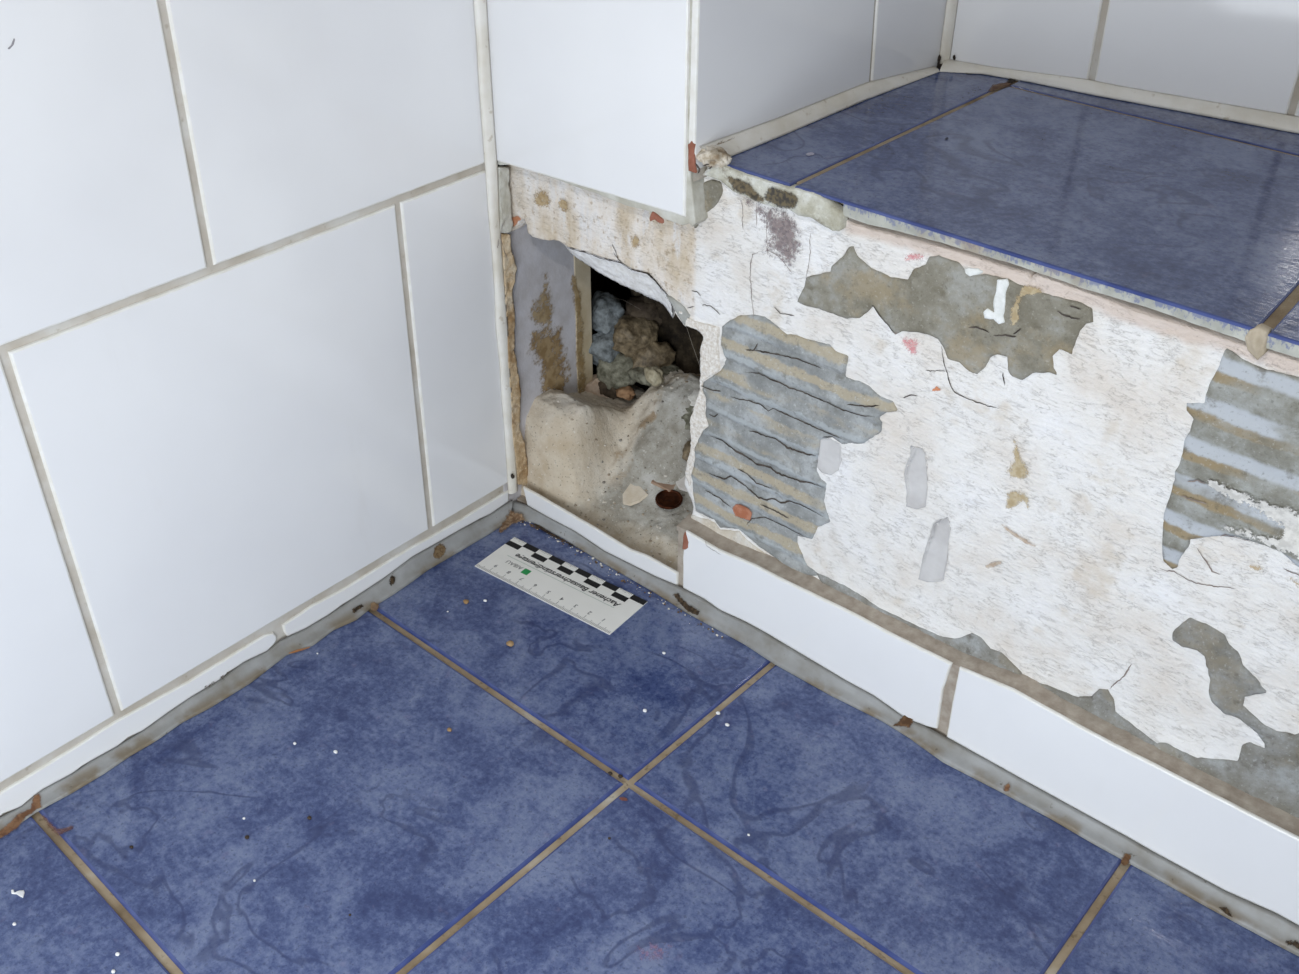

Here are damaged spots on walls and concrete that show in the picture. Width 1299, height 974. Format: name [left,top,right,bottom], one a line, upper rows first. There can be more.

flaking render [565,245,720,492]
spalling [817,438,841,475]
peeling [623,484,648,506]